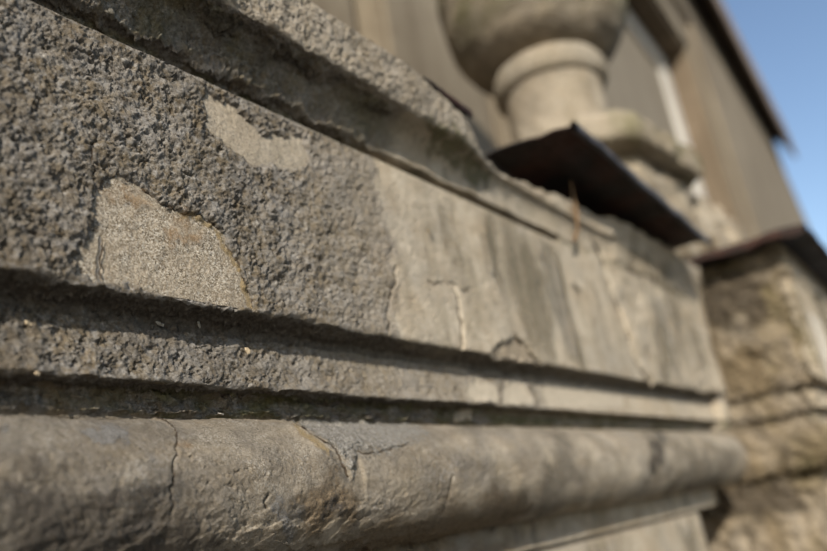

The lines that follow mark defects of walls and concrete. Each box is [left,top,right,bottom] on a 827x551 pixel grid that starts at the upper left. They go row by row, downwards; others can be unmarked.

spalling [203,93,309,170]
spalling [69,175,253,310]
crack [427,281,472,349]
crack [154,417,178,510]